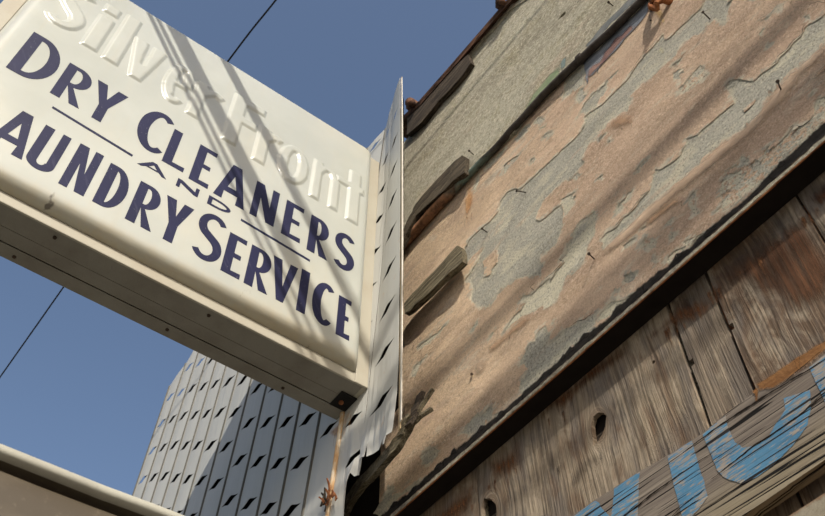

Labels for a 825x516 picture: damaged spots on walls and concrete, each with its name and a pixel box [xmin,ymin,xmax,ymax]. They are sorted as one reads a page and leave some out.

peeling [465,0,825,331]
peeling [462,403,498,434]
peeling [519,288,630,394]
crack [623,351,825,516]
rust [753,341,825,400]